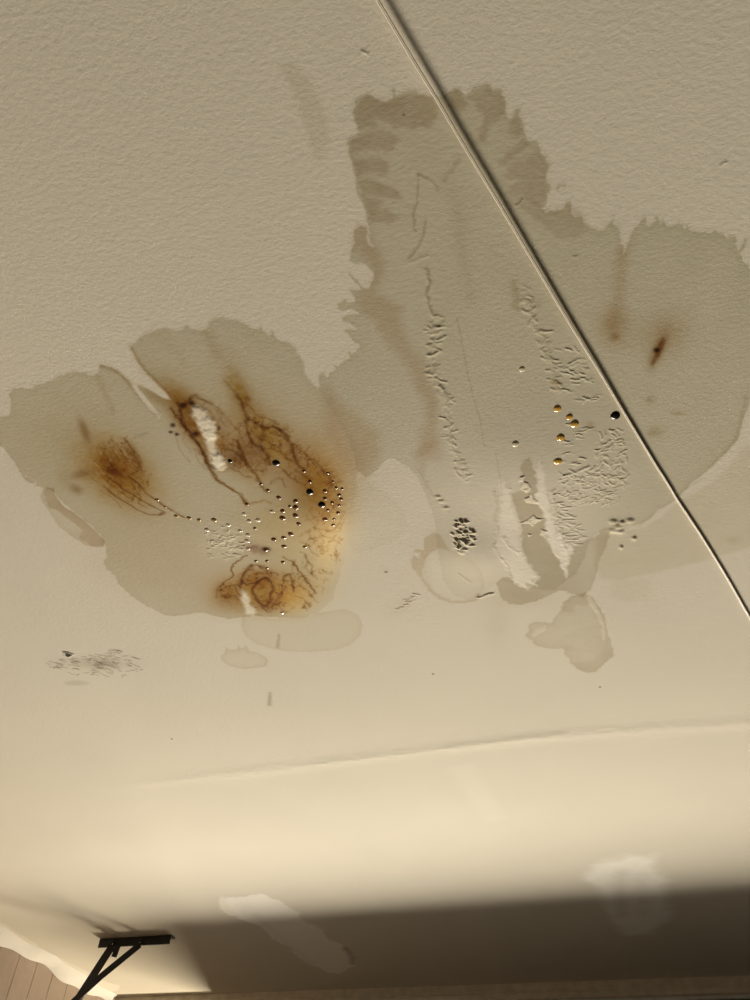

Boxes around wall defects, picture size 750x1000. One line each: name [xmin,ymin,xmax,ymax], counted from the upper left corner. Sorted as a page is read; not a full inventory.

water stain [0,315,364,670]
peeling [189,402,229,472]
rust [44,346,389,630]
water stain [277,61,750,399]
water stain [475,488,750,674]
rust [584,288,709,378]